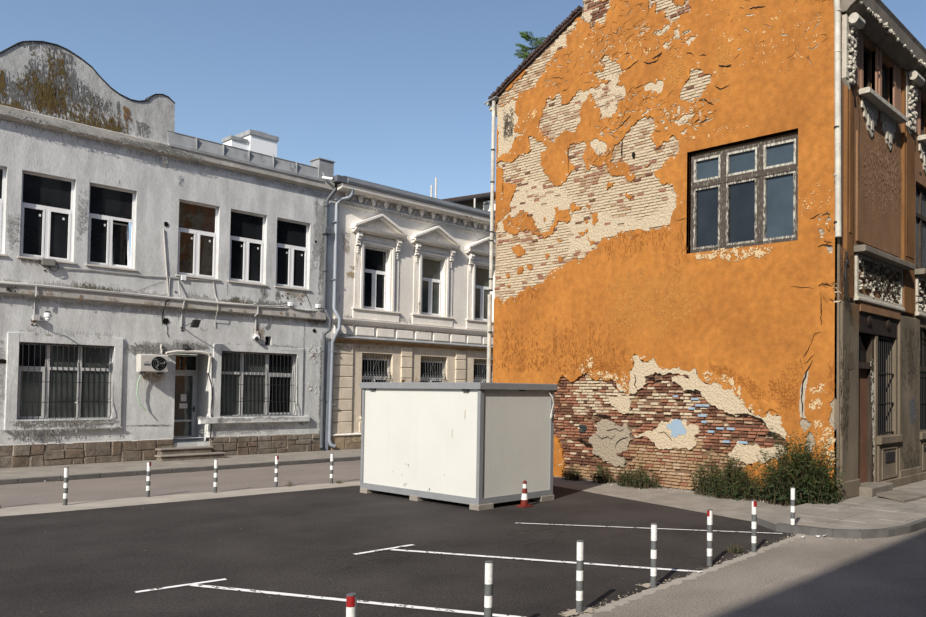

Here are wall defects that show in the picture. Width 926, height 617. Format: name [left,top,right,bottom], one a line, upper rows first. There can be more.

peeling [710,5,811,66]
flaking render [494,0,748,306]
water stain [0,42,328,446]
peeling [695,245,772,261]
crack [792,280,841,416]
flaking render [554,357,791,489]
flaking render [800,383,836,466]